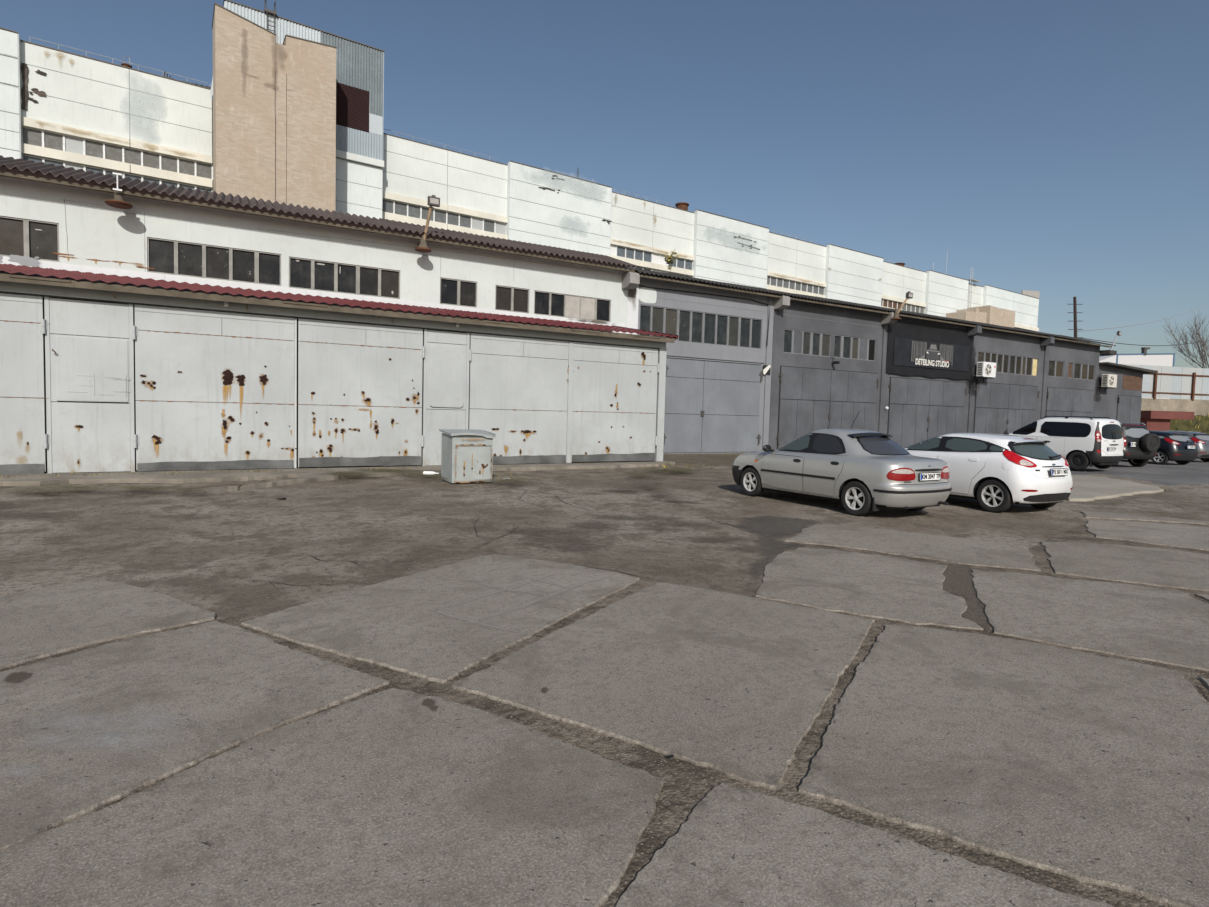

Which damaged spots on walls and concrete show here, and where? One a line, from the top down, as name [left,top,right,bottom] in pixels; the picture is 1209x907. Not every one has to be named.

spalling [21,63,47,110]
rust [214,366,297,458]
rust [278,380,420,457]
rust [455,428,536,483]
spalling [941,563,989,626]